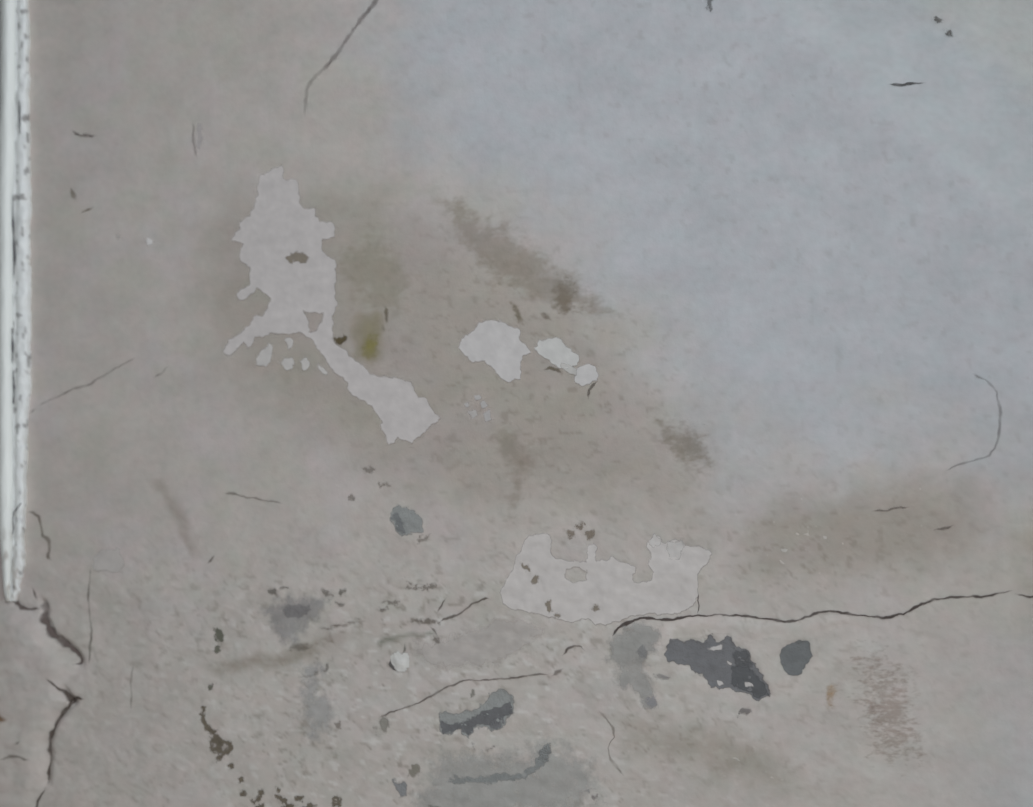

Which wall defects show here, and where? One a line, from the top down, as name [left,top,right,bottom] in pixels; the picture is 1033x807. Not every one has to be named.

peeling [223,165,440,444]
peeling [458,320,598,395]
crack [10,680,82,807]
crack [15,590,92,665]
crack [386,674,540,715]
flaking render [439,689,514,738]
peeling [500,523,770,714]
flaking render [780,640,813,675]
crack [613,591,1033,635]